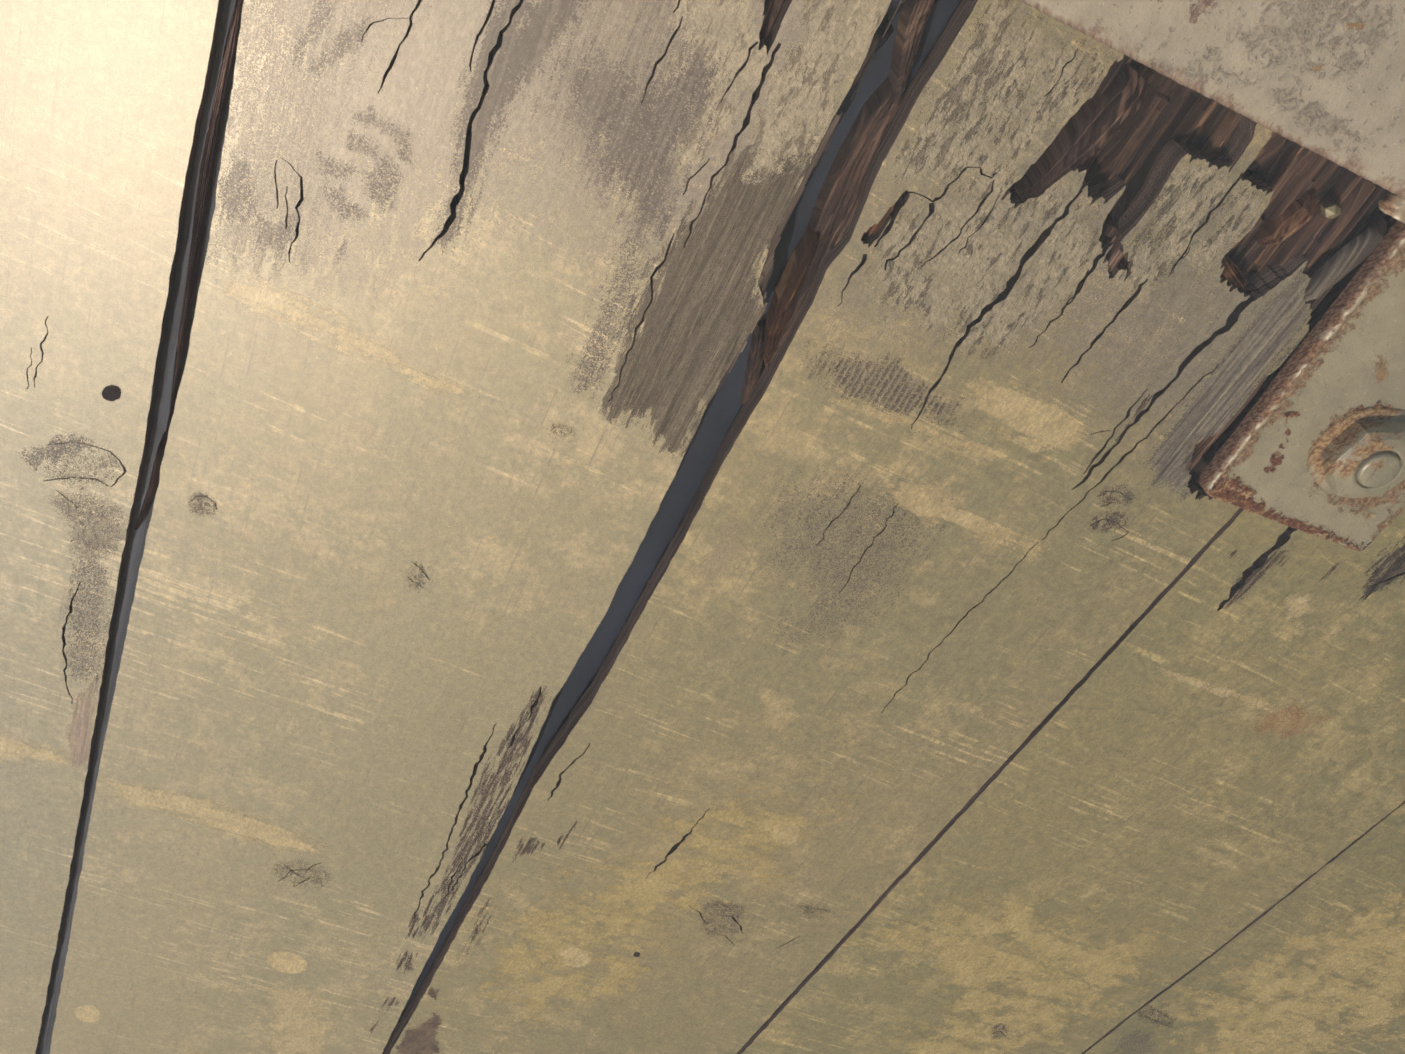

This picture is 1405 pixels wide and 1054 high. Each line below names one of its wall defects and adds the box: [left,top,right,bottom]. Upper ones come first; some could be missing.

water stain [21,434,100,471]
crack [361,0,422,94]
crack [418,0,524,261]
water stain [430,0,732,400]
crack [838,167,1000,306]
crack [911,189,1082,428]
crack [882,290,1257,712]
peeling [1112,160,1274,304]
spalling [1145,0,1399,161]
corrosion [1209,243,1405,550]
peeling [1321,201,1341,219]
crack [414,687,541,918]